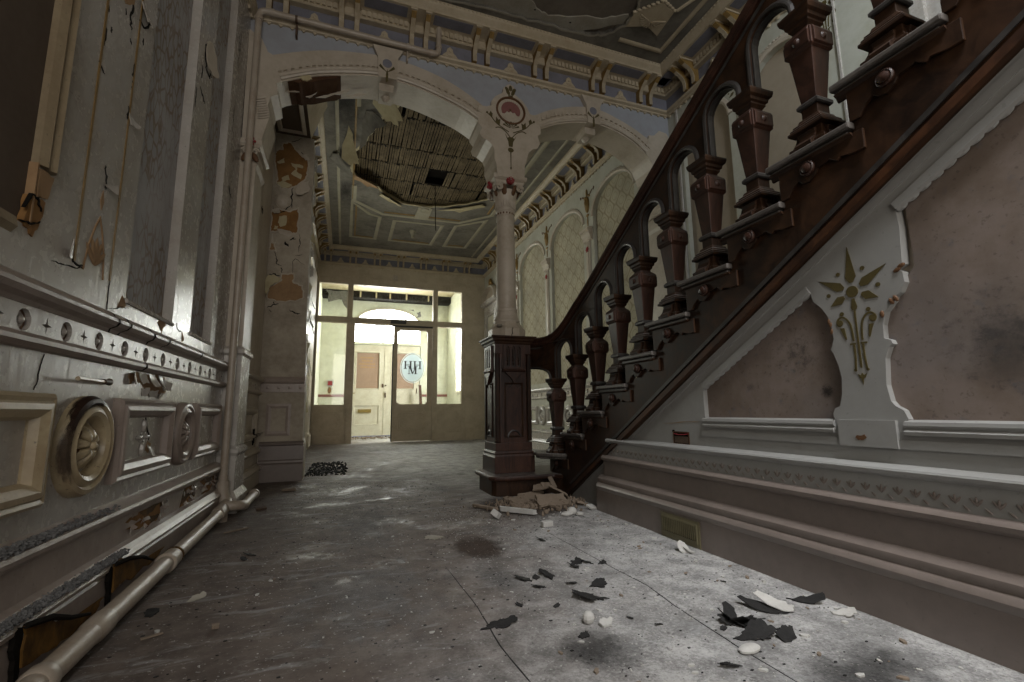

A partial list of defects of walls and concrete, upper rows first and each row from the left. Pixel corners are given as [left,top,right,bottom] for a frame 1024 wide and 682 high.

peeling [17,161,55,237]
flaking render [261,75,488,376]
peeling [126,474,217,535]